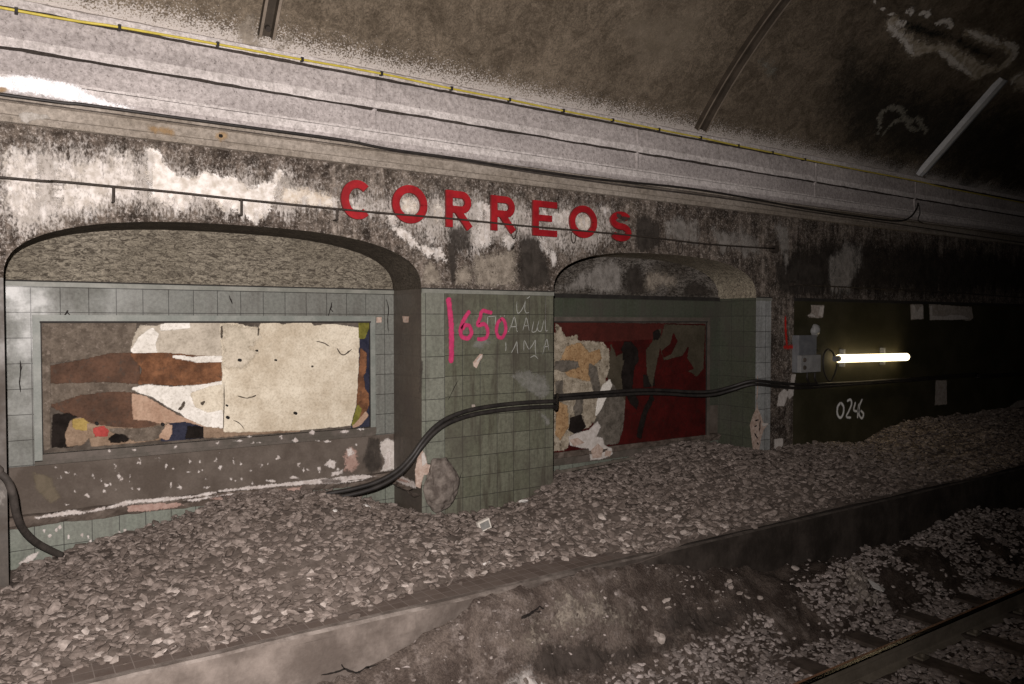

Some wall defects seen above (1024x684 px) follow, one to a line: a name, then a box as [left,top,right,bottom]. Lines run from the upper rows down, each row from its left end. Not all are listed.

water stain [873,0,1024,93]
water stain [836,49,1024,191]
water stain [0,137,713,296]
spalling [750,375,783,450]
peeling [35,438,430,542]